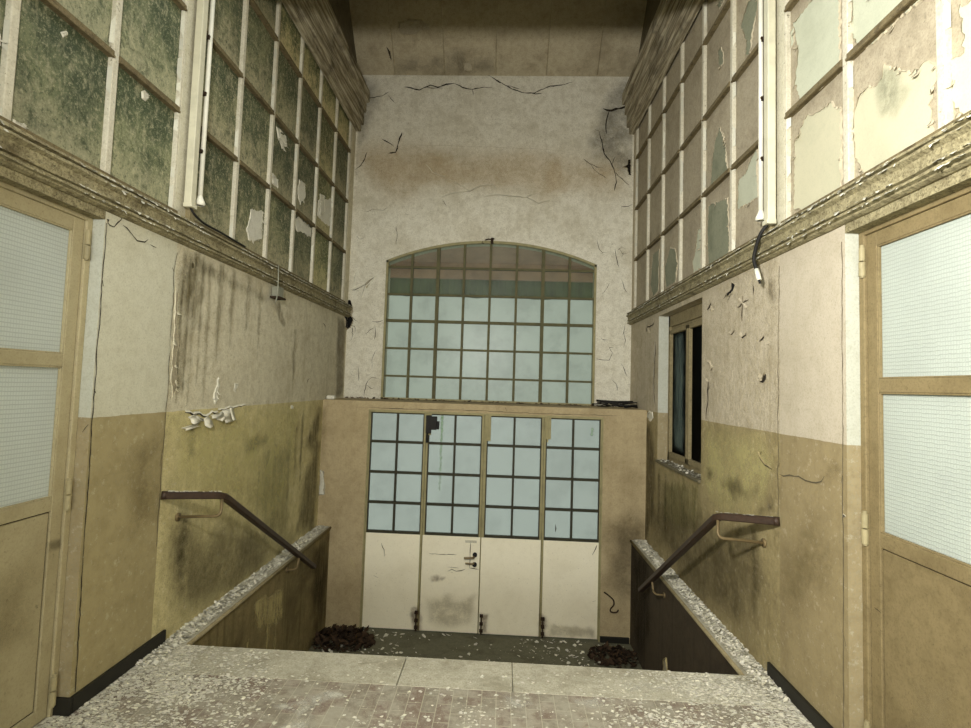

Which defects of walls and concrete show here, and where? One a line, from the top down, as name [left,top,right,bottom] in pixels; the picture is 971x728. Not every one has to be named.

crack [371,75,571,103]
peeling [790,0,971,210]
peeling [276,127,288,152]
crack [355,133,402,170]
crack [584,106,629,207]
peeling [710,127,728,185]
peeling [246,209,266,244]
peeling [297,180,306,205]
peeling [295,217,311,237]
peeling [693,149,758,273]
peeling [183,377,246,430]